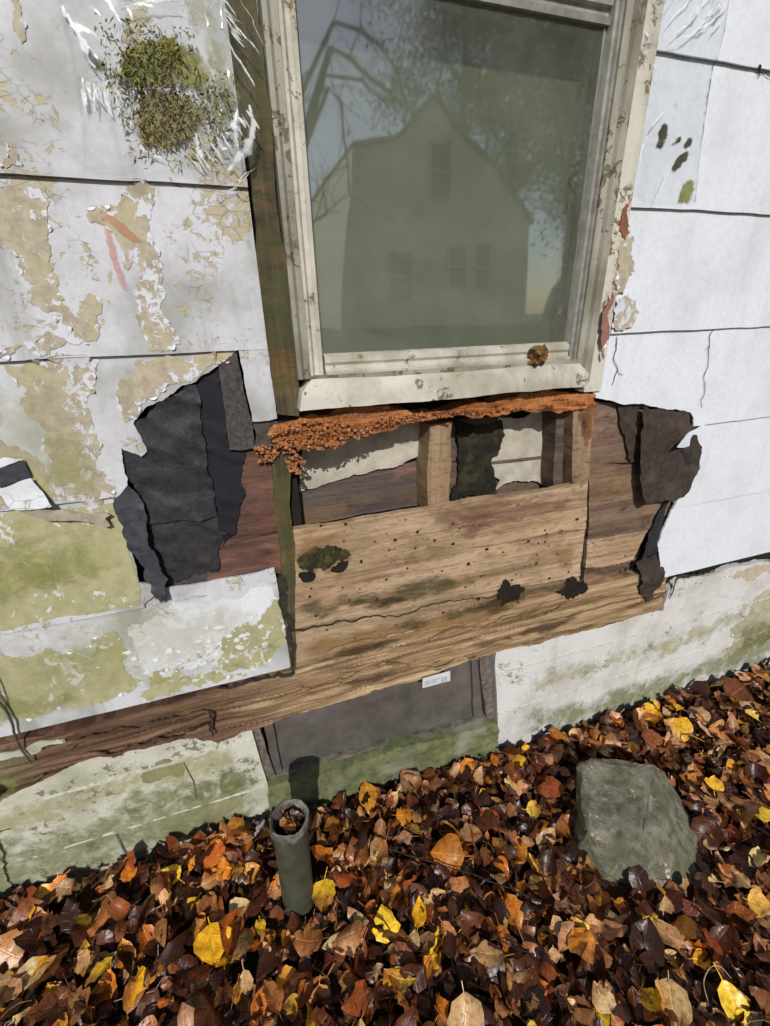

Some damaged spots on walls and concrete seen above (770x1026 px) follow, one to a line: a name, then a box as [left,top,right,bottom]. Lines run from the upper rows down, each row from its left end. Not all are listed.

peeling [86,178,232,422]
peeling [600,199,640,360]
crack [701,329,714,408]
spalling [254,393,531,491]
spalling [312,506,420,524]
water stain [339,620,422,657]
water stain [302,579,471,618]
water stain [448,599,508,619]
water stain [509,617,575,640]
peeling [723,589,770,659]
water stain [131,773,241,804]
crack [0,829,15,890]